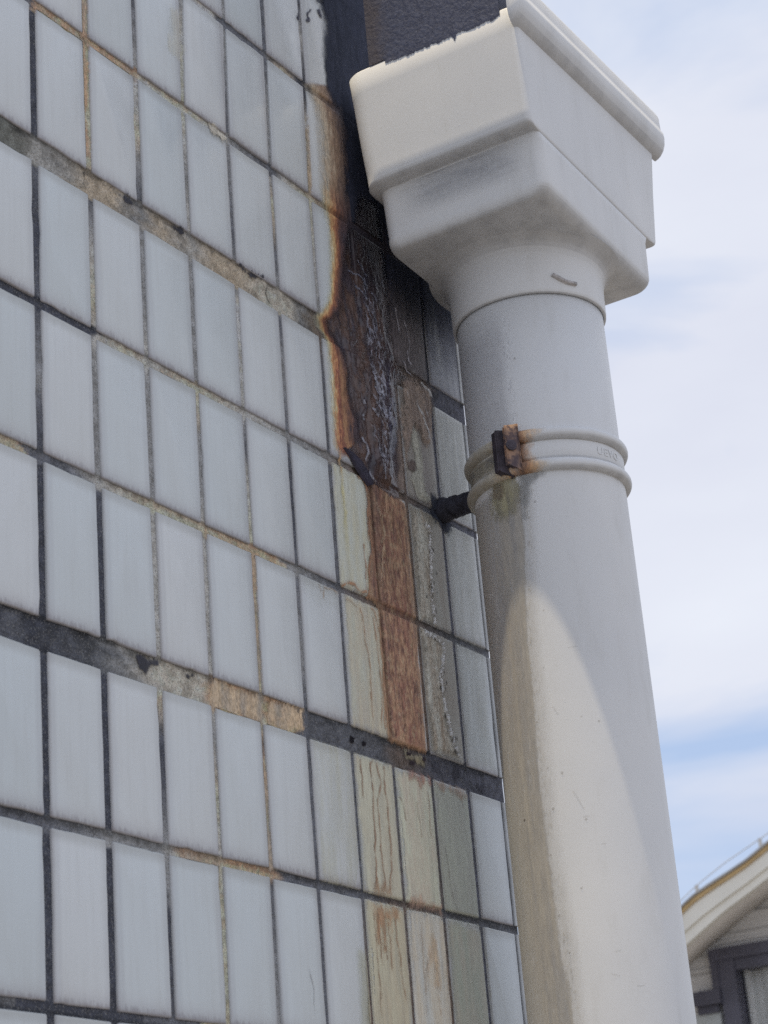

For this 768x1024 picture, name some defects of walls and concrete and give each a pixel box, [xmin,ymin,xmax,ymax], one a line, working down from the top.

corrosion [209,678,303,731]
corrosion [305,84,406,464]
corrosion [341,428,427,753]
damp [321,0,453,735]
corrosion [512,430,538,476]